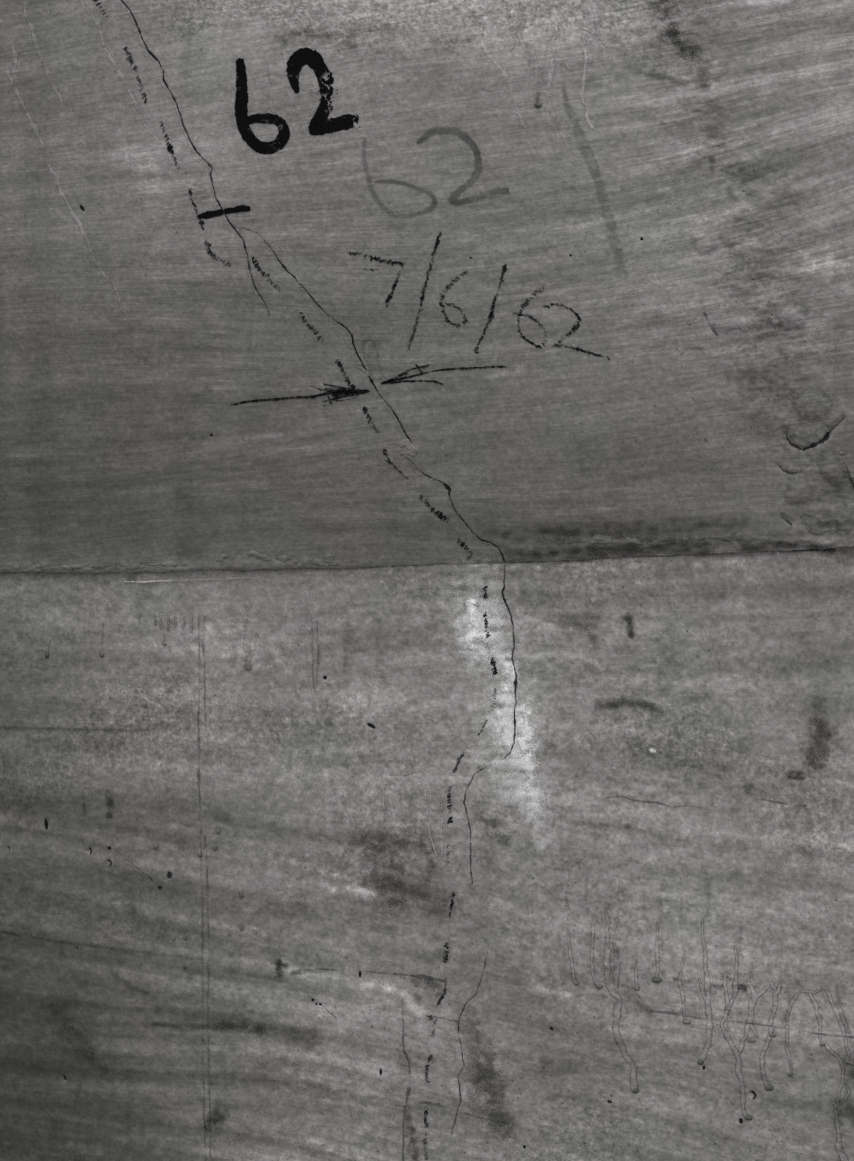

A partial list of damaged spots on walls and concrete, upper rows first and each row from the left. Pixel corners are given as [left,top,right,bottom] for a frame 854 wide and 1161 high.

crack [121,0,517,756]
damp [457,598,541,817]
crack [463,769,482,884]
crack [291,985,336,1020]
crack [438,960,486,1127]
damp [585,870,664,1093]
damp [697,871,854,1161]